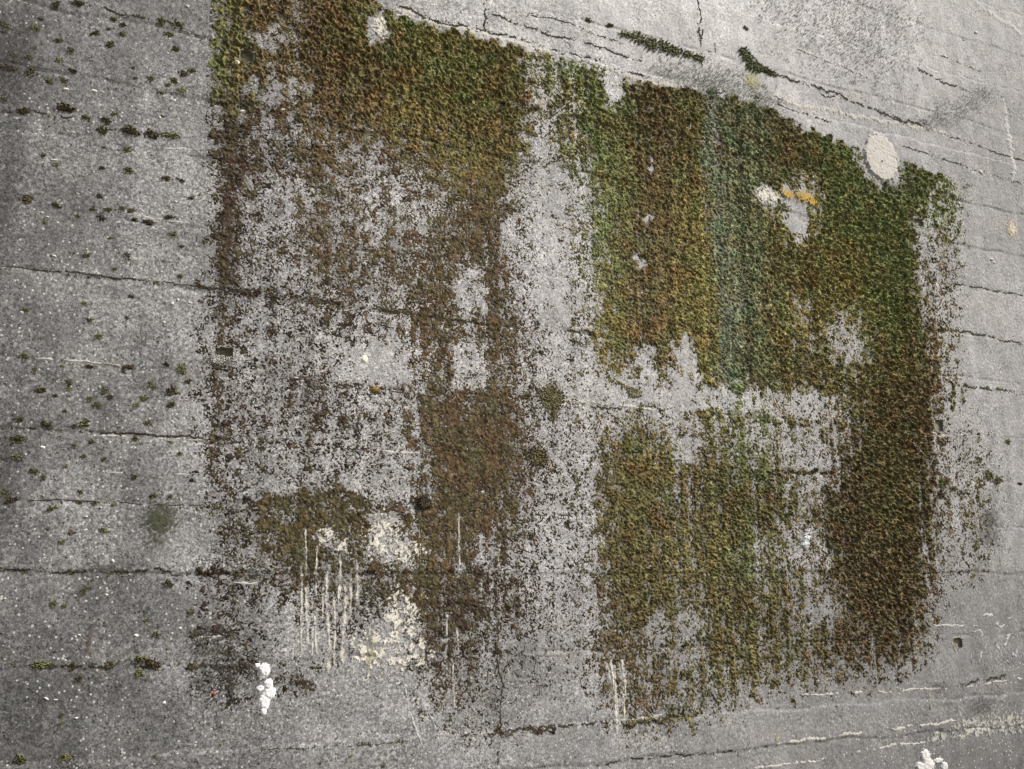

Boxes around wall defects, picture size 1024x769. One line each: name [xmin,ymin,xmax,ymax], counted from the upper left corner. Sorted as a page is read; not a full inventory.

crack [483,2,641,73]
crack [697,0,716,65]
water stain [648,55,784,114]
water stain [745,0,925,101]
crack [751,54,1022,184]
crack [6,265,343,304]
crack [399,308,485,324]
water stain [300,530,359,670]
water stain [172,610,263,722]
crack [491,618,514,761]
water stain [608,659,626,741]